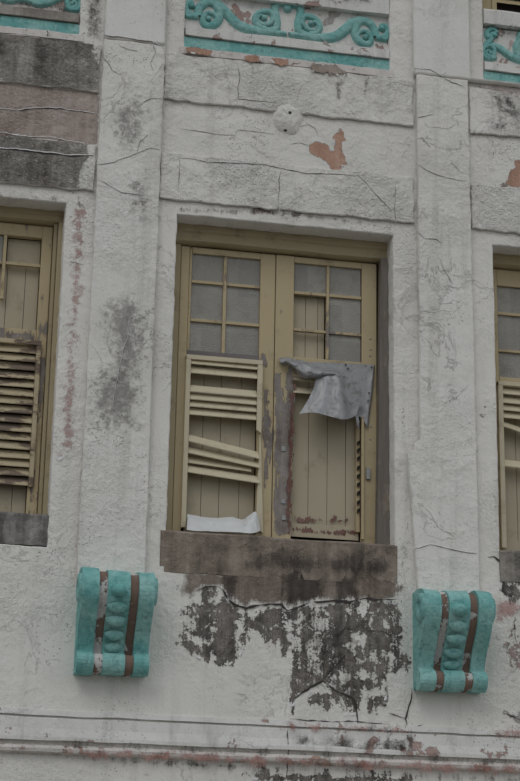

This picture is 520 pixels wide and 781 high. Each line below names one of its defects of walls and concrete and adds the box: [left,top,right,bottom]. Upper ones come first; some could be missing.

peeling [323,11,341,26]
leakage [0,34,99,90]
peeling [244,55,289,66]
peeling [308,60,347,76]
crack [0,106,93,114]
crack [0,132,160,195]
crack [178,157,396,223]
peeling [309,129,347,170]
peeling [501,160,520,188]
flaking render [175,585,412,716]
peeling [497,601,520,668]
peeling [242,768,416,781]